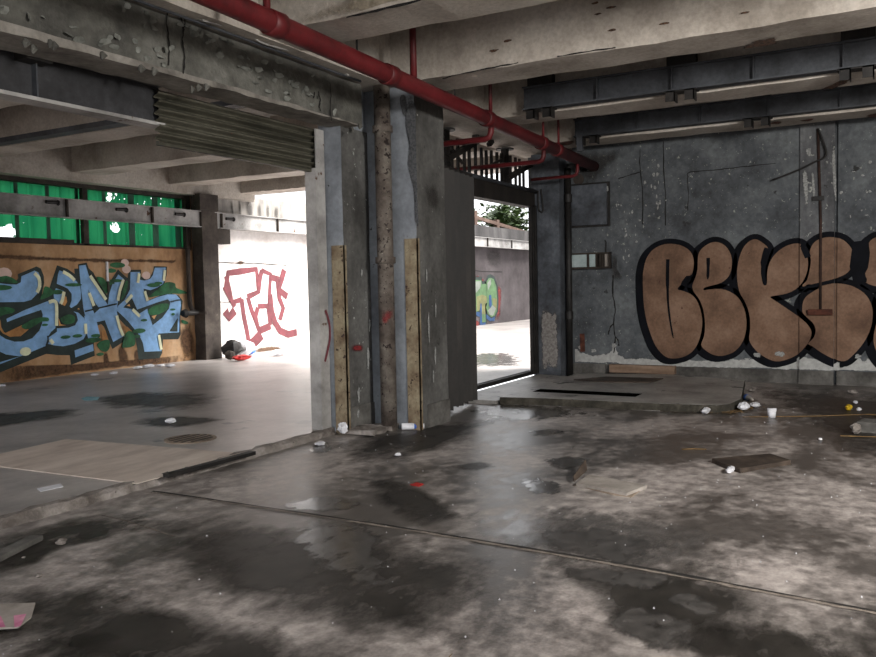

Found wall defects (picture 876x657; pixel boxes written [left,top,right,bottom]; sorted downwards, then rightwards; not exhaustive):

crack [346,0,421,18]
crack [166,13,186,74]
peeling [177,22,323,107]
peeling [541,311,558,369]
crack [608,275,620,353]
peeling [575,343,876,371]
leakage [0,410,71,426]
leakage [99,393,218,427]
leakage [373,482,451,520]
leakage [2,590,306,657]